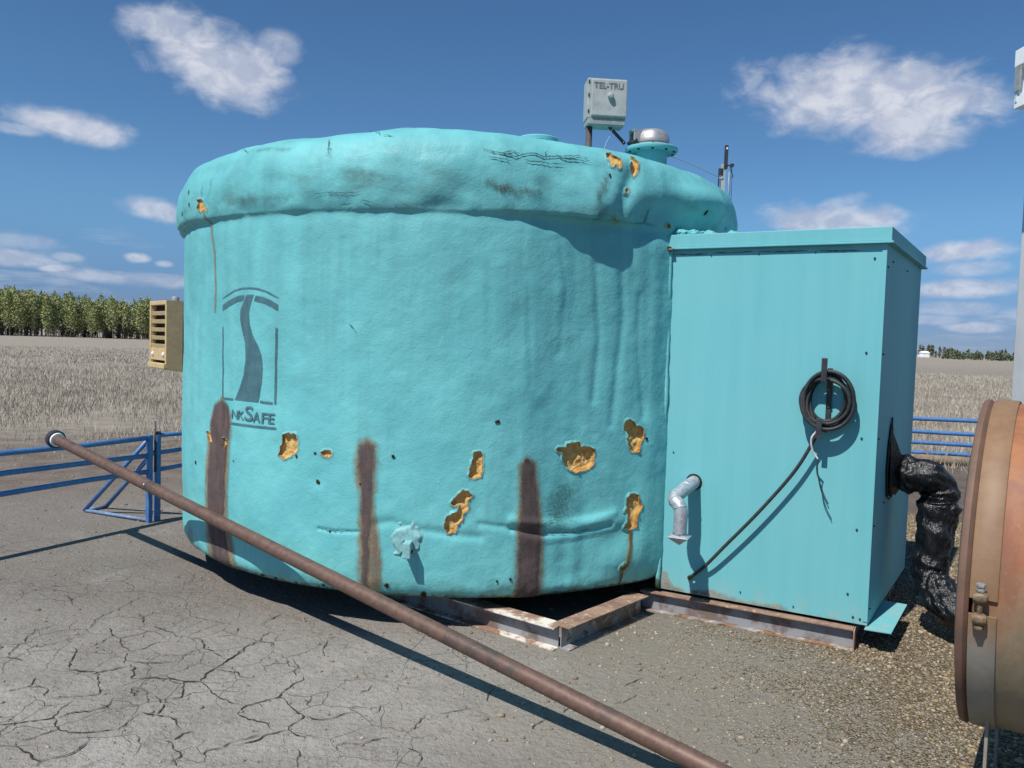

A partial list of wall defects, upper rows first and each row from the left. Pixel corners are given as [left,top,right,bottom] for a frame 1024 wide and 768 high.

crack [483,148,588,164]
peeling [604,152,640,196]
peeling [278,431,301,462]
peeling [313,447,334,460]
peeling [554,440,596,475]
peeling [622,417,648,454]
corrosion [205,397,237,569]
corrosion [355,440,381,593]
peeling [442,449,486,536]
corrosion [512,458,544,598]
peeling [621,491,644,532]
crack [0,598,381,766]